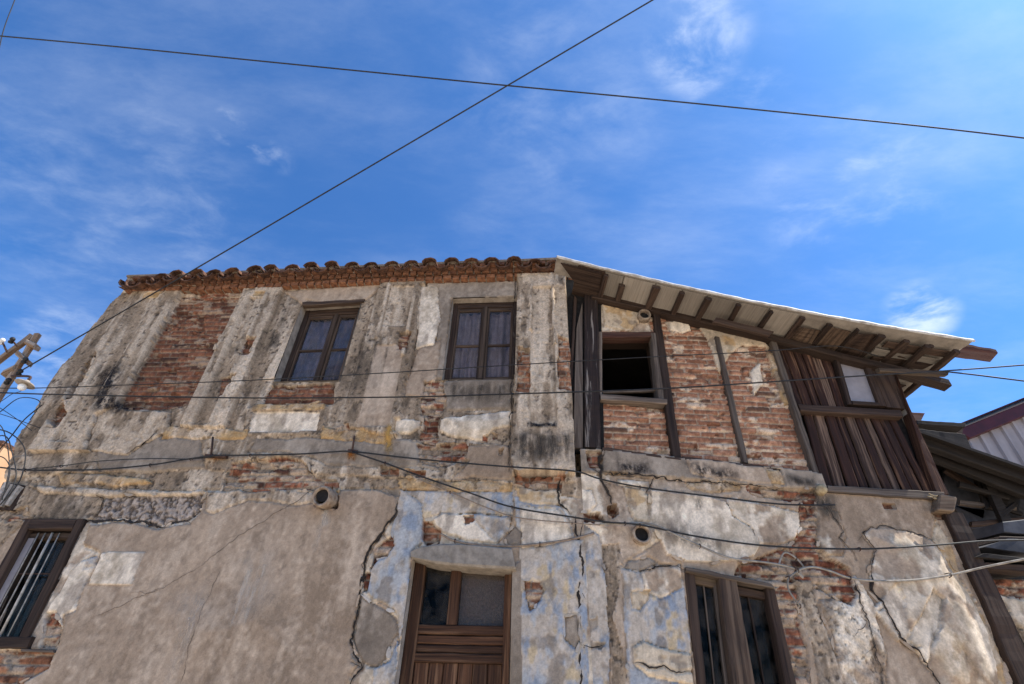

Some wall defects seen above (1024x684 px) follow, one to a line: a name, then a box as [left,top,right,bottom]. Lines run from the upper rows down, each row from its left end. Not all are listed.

water stain [96,367,129,412]
peeling [59,283,888,684]
water stain [519,435,567,459]
flaking render [0,556,100,684]
crack [350,502,398,684]
crack [635,662,694,673]
crack [831,512,940,684]